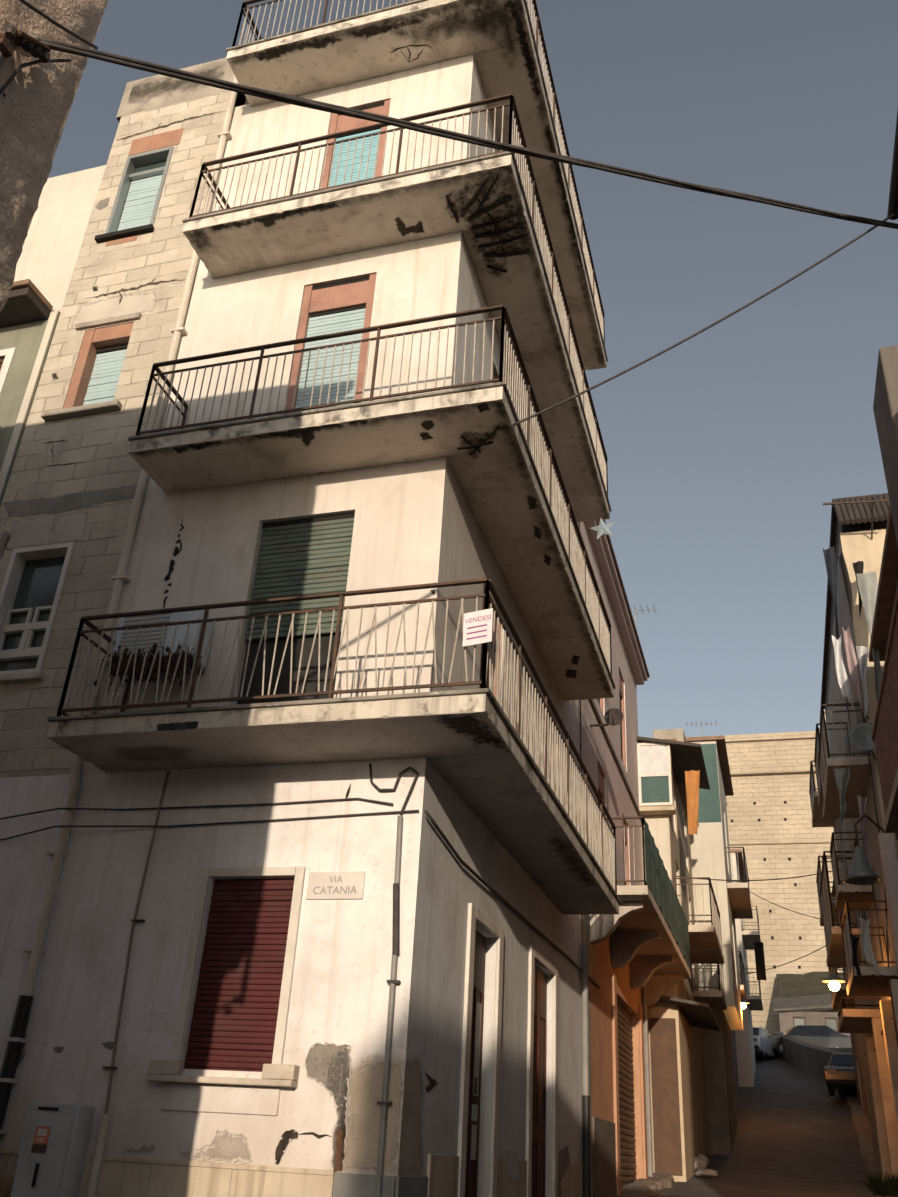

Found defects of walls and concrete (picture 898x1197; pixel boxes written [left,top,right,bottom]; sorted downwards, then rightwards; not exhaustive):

crack [389,45,434,62]
water stain [232,0,589,299]
water stain [189,191,392,249]
spalling [395,218,425,236]
spalling [445,170,530,275]
crack [85,278,184,304]
water stain [528,243,572,388]
spalling [458,425,507,458]
crack [162,519,184,609]
flaking render [305,1042,438,1175]
peeling [181,1130,252,1164]
crack [274,1129,332,1165]